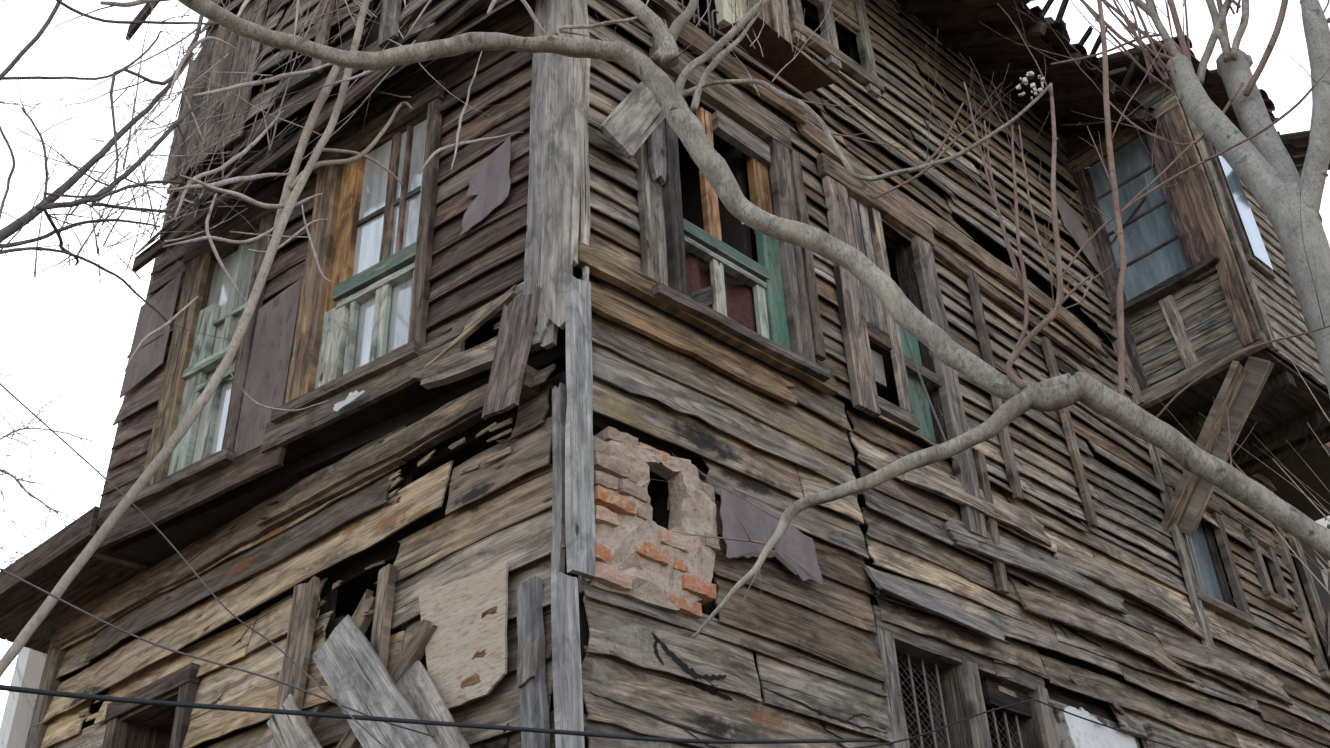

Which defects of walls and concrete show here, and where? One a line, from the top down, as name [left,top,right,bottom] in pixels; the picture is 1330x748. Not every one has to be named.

spalling [572,426,720,619]
peeling [460,649,487,688]
crack [651,632,733,701]
crack [590,691,751,748]
crack [763,687,888,748]